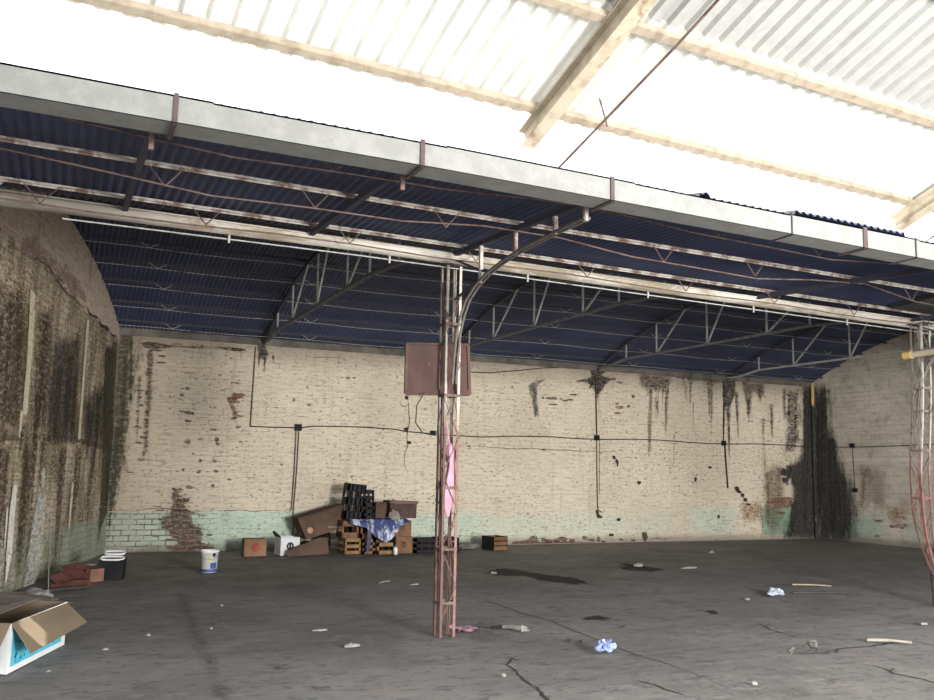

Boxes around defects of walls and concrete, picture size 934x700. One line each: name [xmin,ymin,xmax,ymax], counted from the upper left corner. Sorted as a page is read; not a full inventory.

leakage [0,287,153,588]
peeling [221,382,246,428]
leakage [529,380,542,416]
leakage [578,370,615,400]
leakage [640,375,764,451]
leakage [762,386,858,540]
spalling [151,486,217,551]
crack [461,591,729,688]
crack [492,658,549,700]